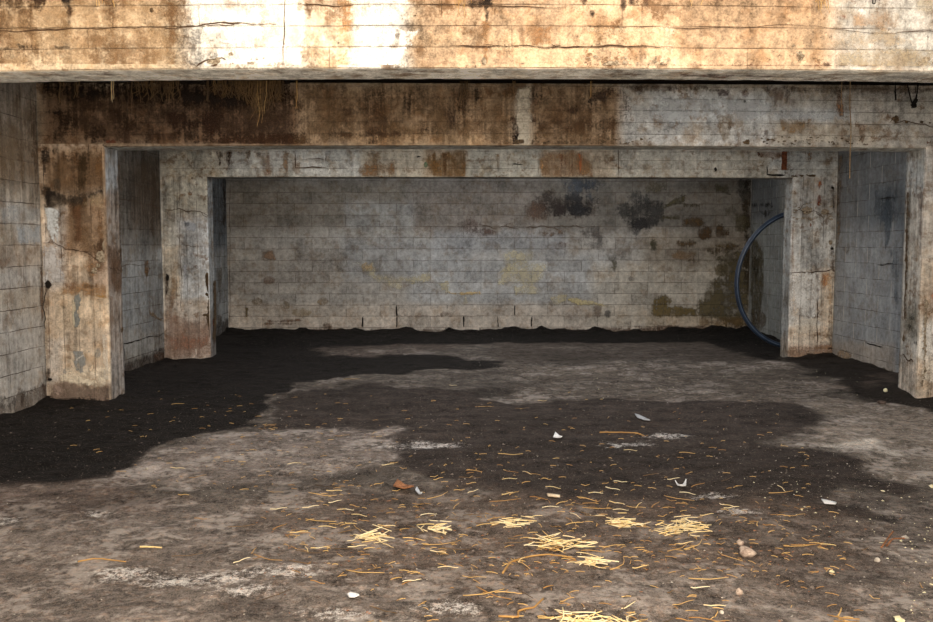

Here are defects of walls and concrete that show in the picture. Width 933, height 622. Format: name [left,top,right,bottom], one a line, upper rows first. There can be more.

leakage [42,82,519,176]
leakage [531,86,629,145]
leakage [22,148,103,262]
leakage [63,217,122,326]
leakage [527,179,599,219]
leakage [569,179,773,332]